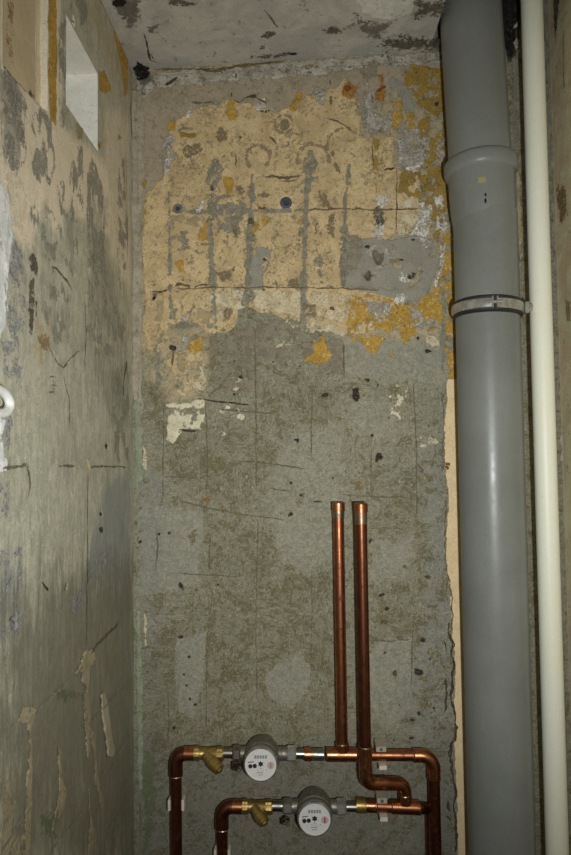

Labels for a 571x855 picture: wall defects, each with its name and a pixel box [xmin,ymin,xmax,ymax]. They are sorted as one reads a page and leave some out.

rust [341,82,358,99]
rust [371,73,386,103]
flaking render [141,63,457,444]
crack [156,282,378,293]
flaking render [74,649,115,855]